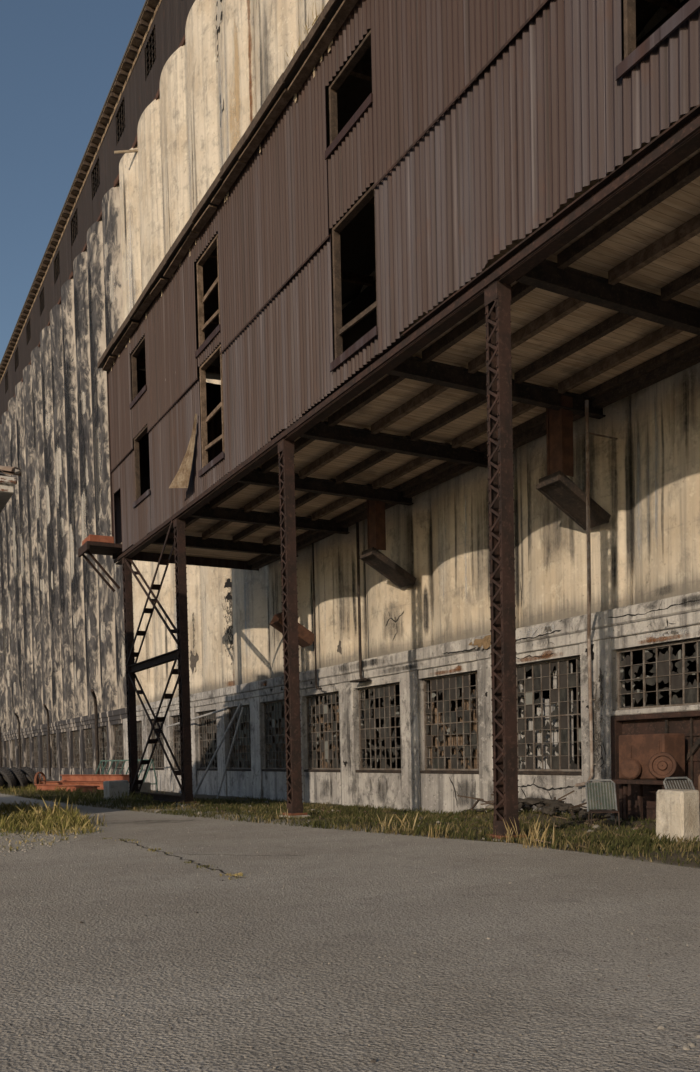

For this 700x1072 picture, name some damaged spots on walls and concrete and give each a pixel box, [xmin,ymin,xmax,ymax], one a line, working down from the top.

leakage [445,495,490,587]
leakage [514,480,530,600]
leakage [609,412,664,588]